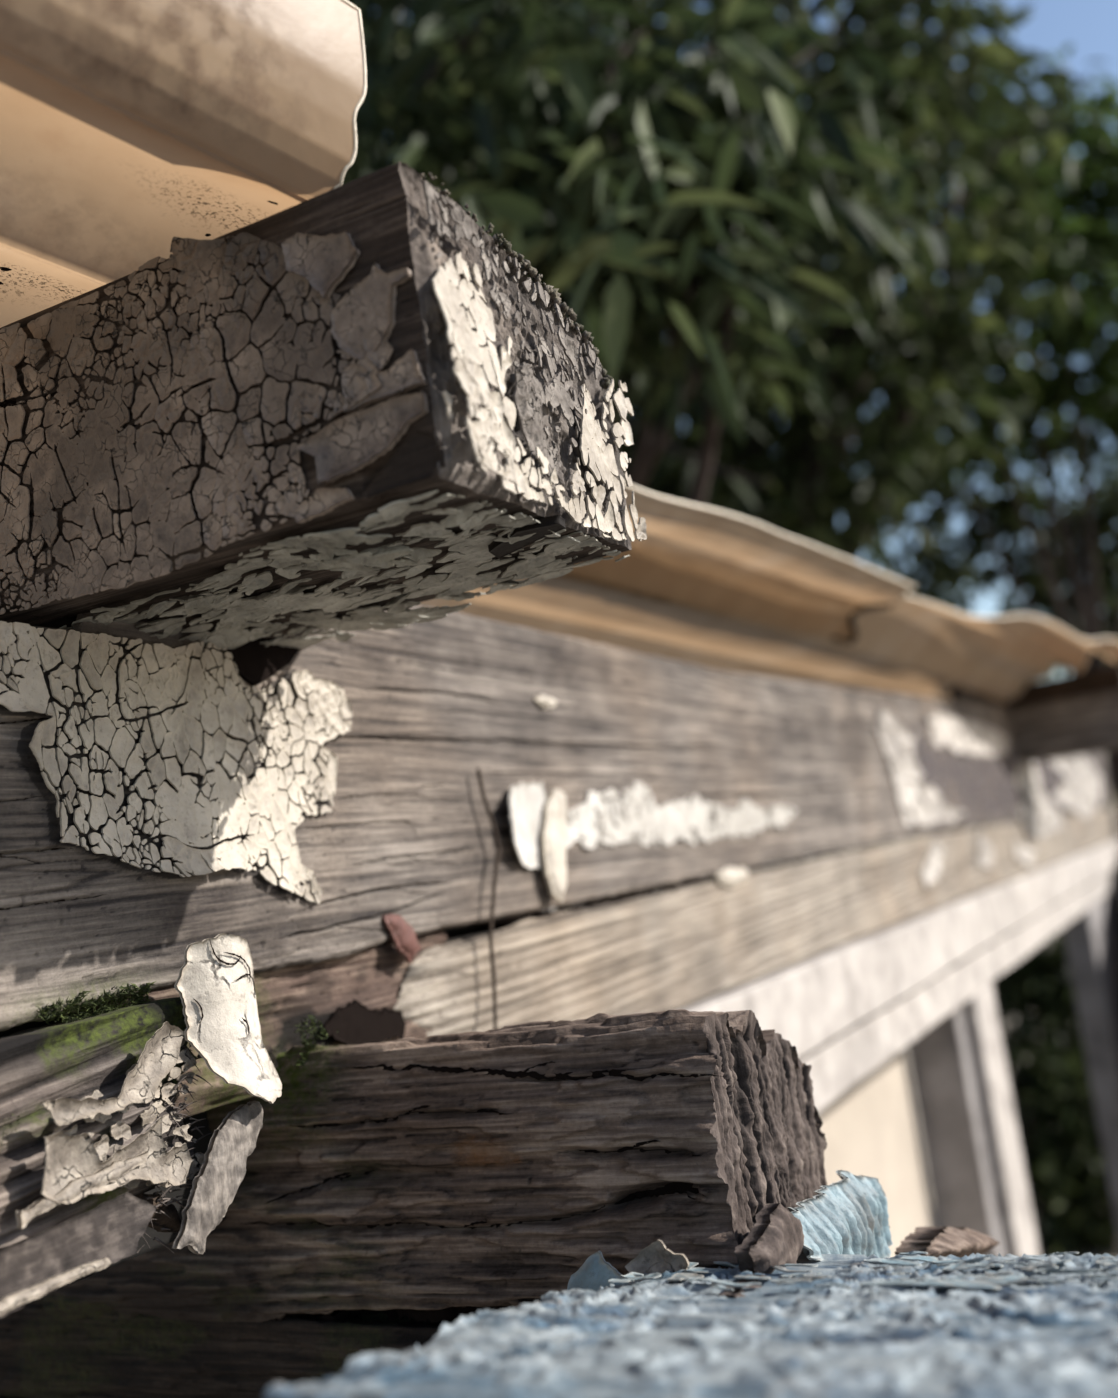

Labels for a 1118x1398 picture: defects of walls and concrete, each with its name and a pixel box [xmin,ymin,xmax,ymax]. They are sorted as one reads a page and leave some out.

crack [0,232,425,615]
peeling [0,172,647,904]
peeling [566,781,798,849]
peeling [712,867,748,887]
crack [344,1061,723,1081]
peeling [46,1039,204,1180]
crack [290,1105,513,1128]
peeling [120,1179,171,1189]
crack [243,1140,706,1229]